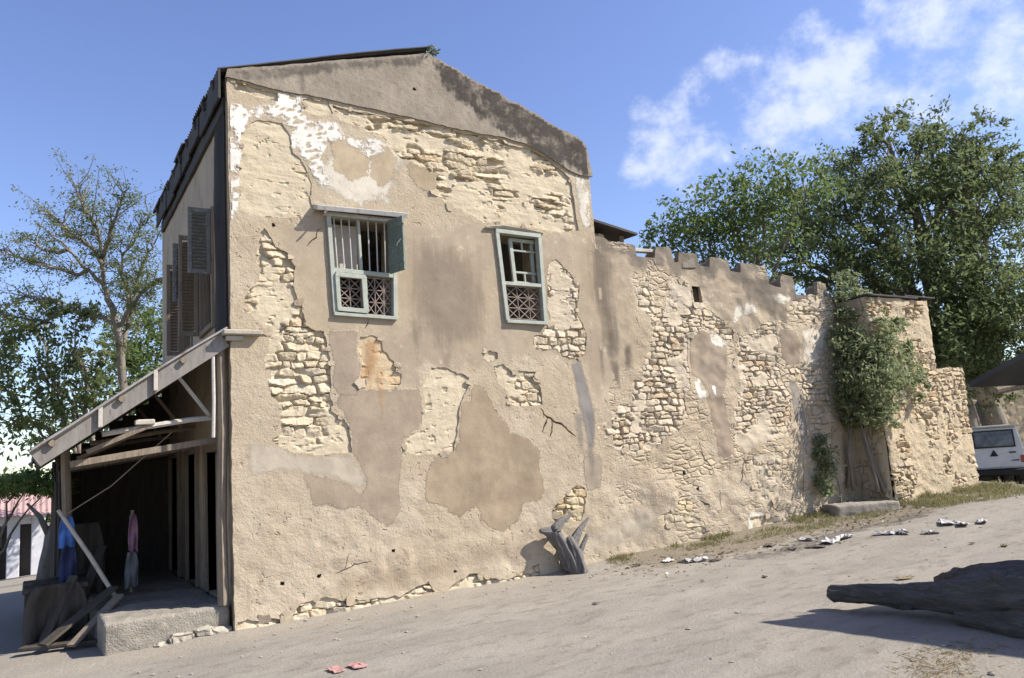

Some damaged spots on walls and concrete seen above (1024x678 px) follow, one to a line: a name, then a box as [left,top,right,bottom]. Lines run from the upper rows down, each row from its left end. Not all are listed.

water stain [262,55,589,177]
flaking render [230,79,591,458]
water stain [573,363,594,446]
flaking render [597,271,836,531]
flaking render [552,485,587,522]
flaking render [233,582,433,630]
flaking render [449,565,539,590]